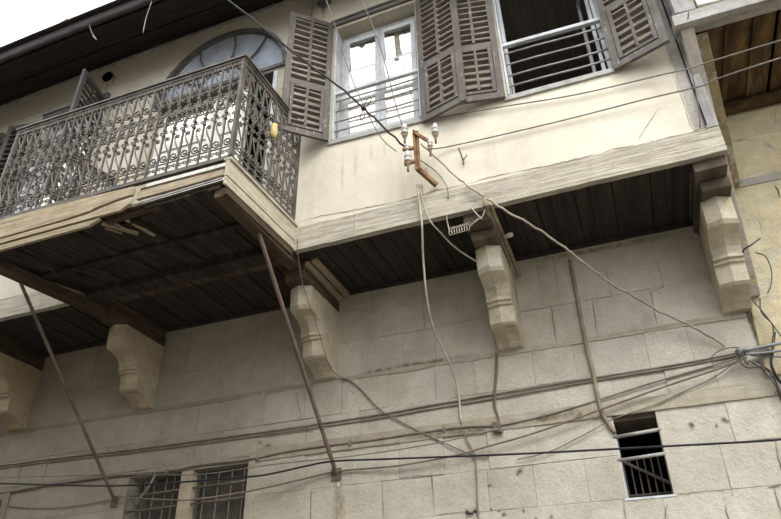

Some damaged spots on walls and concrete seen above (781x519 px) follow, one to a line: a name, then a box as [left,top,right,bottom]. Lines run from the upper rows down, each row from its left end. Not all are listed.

crack [301,108,682,222]